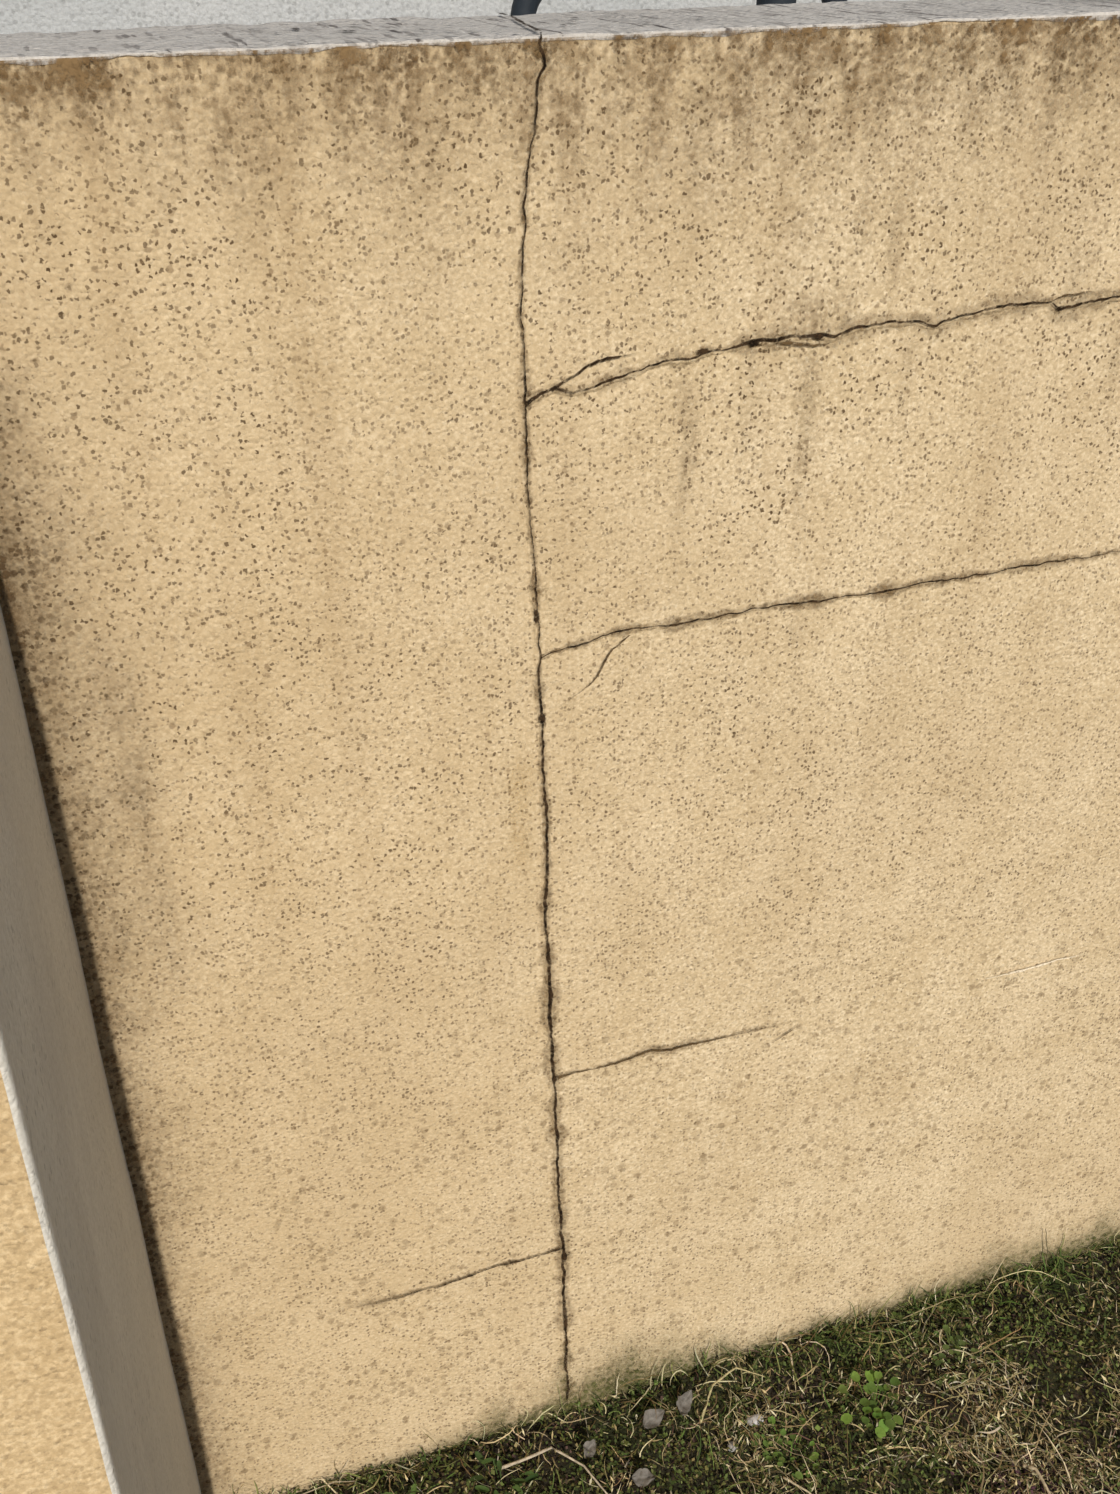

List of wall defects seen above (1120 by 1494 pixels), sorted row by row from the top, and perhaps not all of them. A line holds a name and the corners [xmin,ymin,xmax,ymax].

water stain [0,37,593,127]
water stain [614,15,1119,116]
crack [394,13,1120,1410]